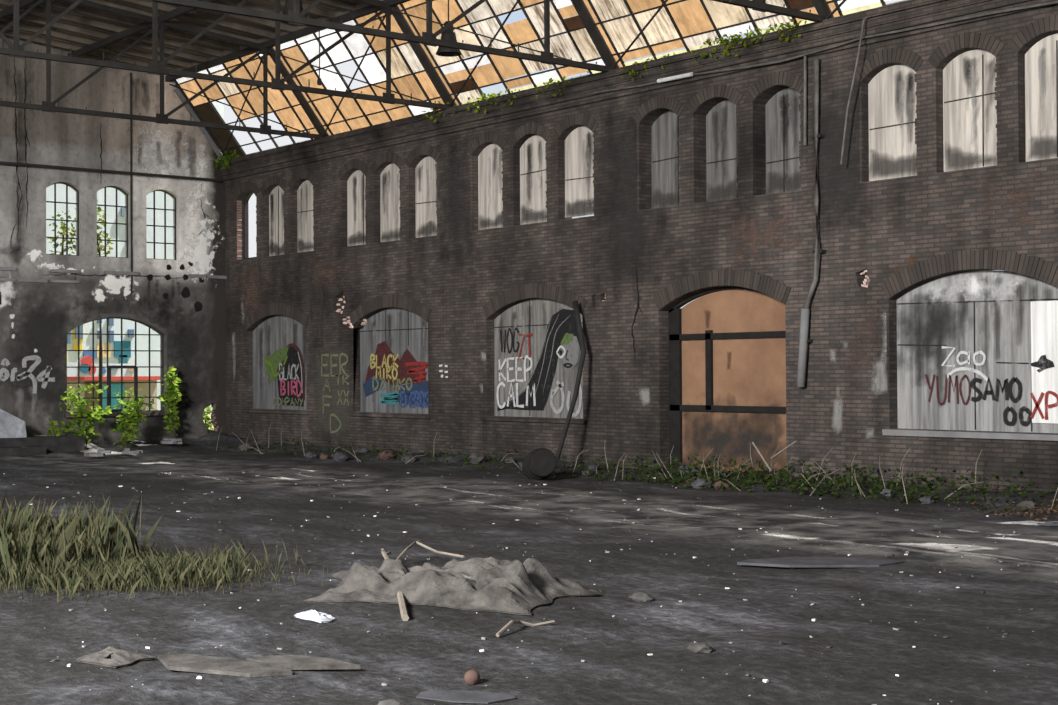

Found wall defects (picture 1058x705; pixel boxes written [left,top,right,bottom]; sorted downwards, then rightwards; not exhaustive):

flaking render [27,249,95,274]
flaking render [92,180,223,312]
flaking render [0,281,15,339]